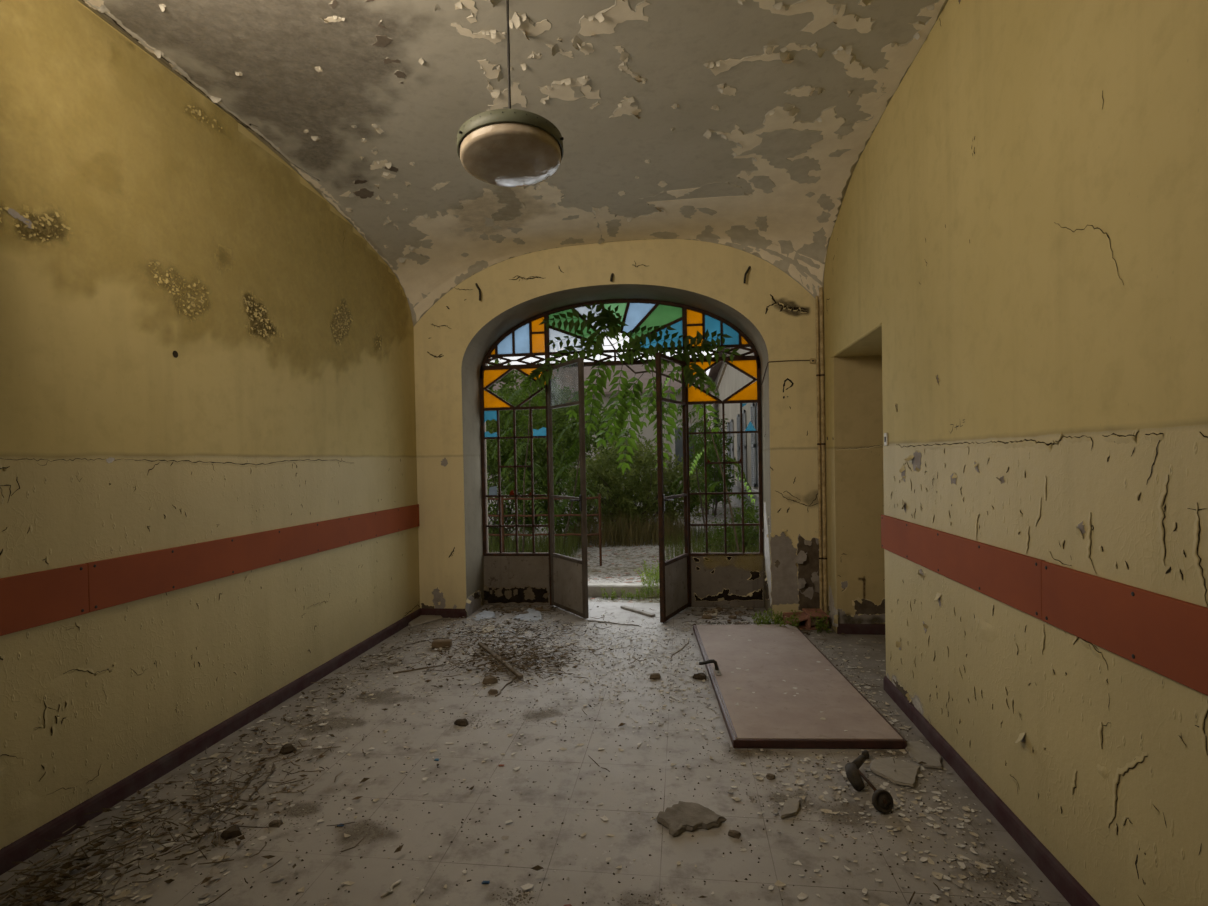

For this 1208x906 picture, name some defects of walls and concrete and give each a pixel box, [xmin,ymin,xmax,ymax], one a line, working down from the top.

damp [118,0,398,168]
peeling [291,0,961,322]
crack [1054,222,1124,286]
damp [147,261,210,320]
damp [244,295,276,338]
spalling [899,450,922,482]
spalling [5,502,1049,906]